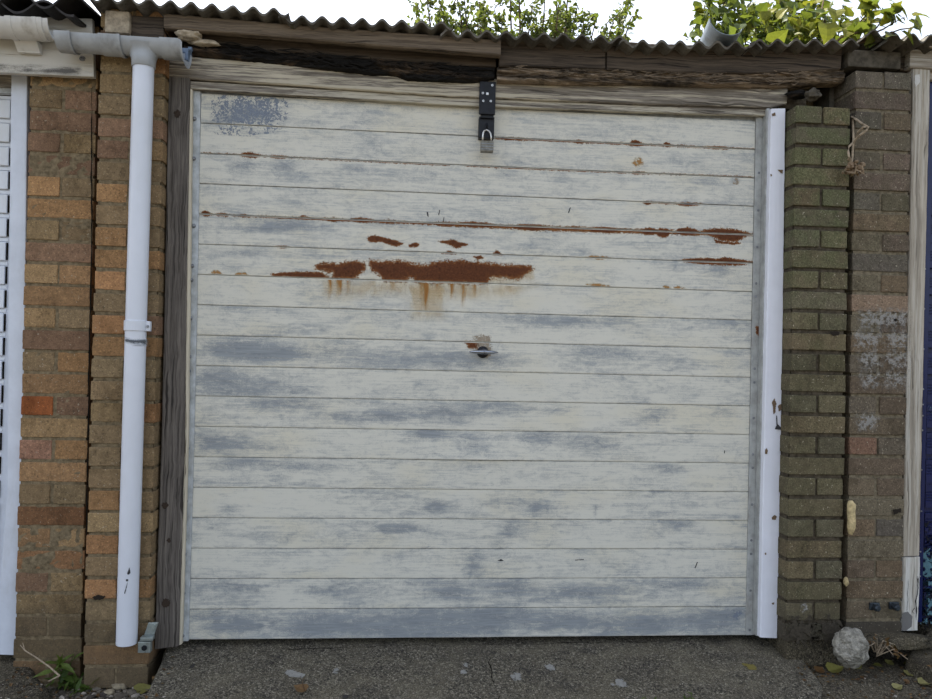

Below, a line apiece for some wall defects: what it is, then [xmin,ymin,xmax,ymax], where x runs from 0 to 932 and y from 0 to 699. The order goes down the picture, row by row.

corrosion [367,235,420,248]
corrosion [260,215,753,245]
corrosion [270,239,533,306]
corrosion [683,256,753,266]
peeling [902,521,932,631]